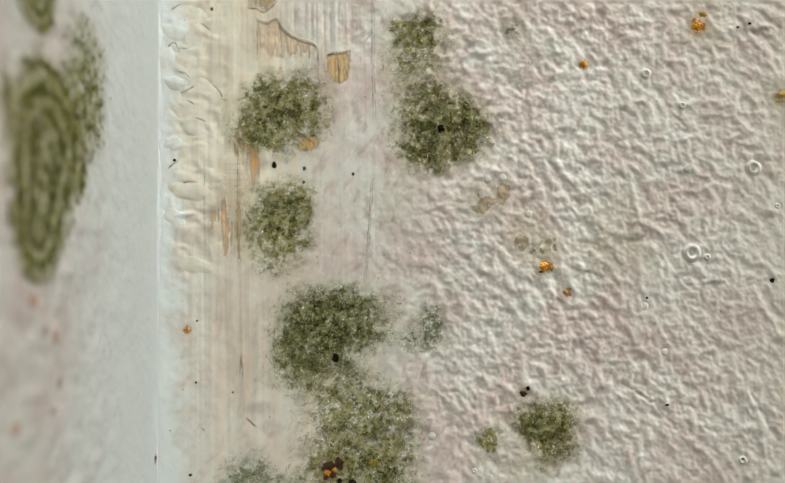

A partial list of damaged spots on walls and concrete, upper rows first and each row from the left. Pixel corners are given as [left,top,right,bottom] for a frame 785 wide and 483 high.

damp [19,0,56,34]
damp [1,14,111,285]
peeling [250,0,319,58]
damp [224,57,345,280]
peeling [327,52,349,82]
damp [379,10,499,177]
damp [212,282,452,483]
damp [475,396,582,476]